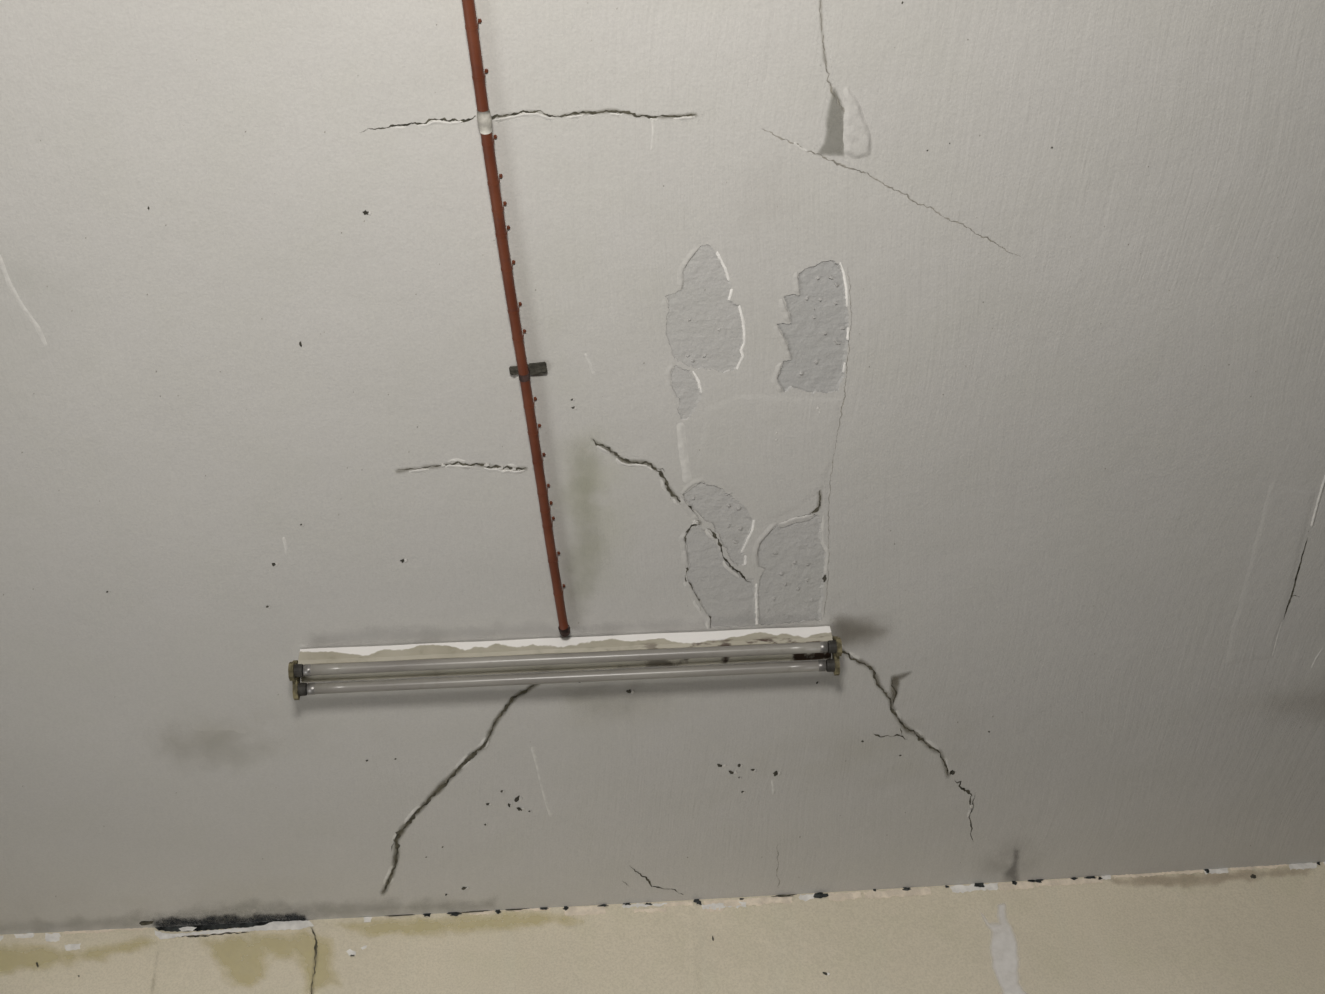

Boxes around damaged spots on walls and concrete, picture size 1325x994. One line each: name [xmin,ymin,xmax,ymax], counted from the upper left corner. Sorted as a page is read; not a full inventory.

crack [363,110,696,132]
crack [763,129,1019,256]
peeling [661,244,746,420]
peeling [771,260,850,395]
crack [402,458,526,474]
crack [594,440,749,629]
peeling [679,478,827,628]
crack [1272,475,1325,657]
crack [382,684,538,892]
crack [842,644,974,840]
damp [139,914,314,939]
crack [310,928,318,994]